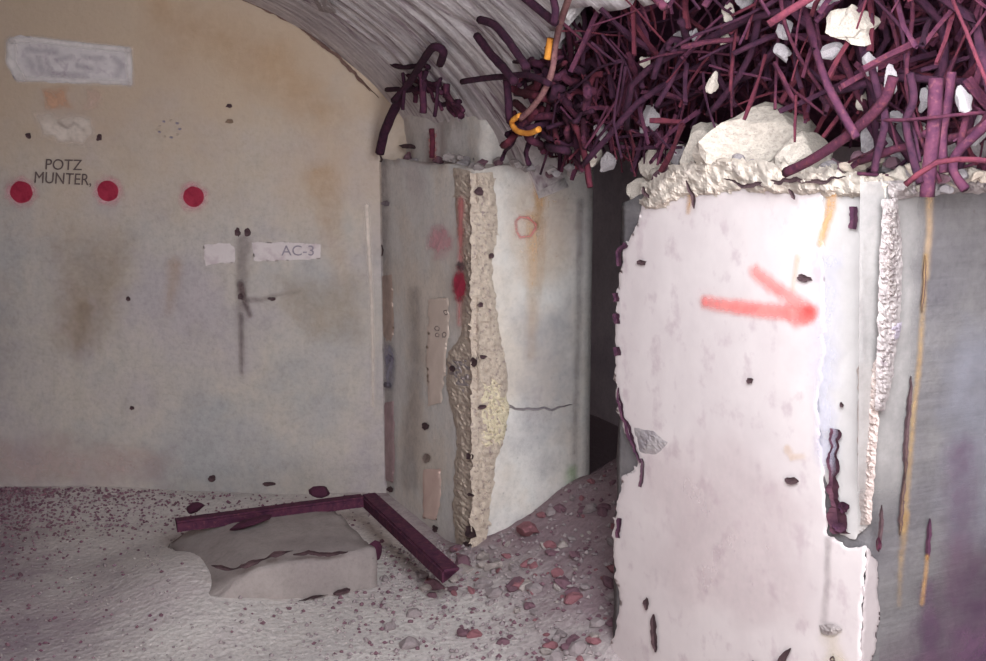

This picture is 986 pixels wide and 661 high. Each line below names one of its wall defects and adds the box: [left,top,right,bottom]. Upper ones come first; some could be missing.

crack [506,404,572,431]
peeling [375,0,986,661]